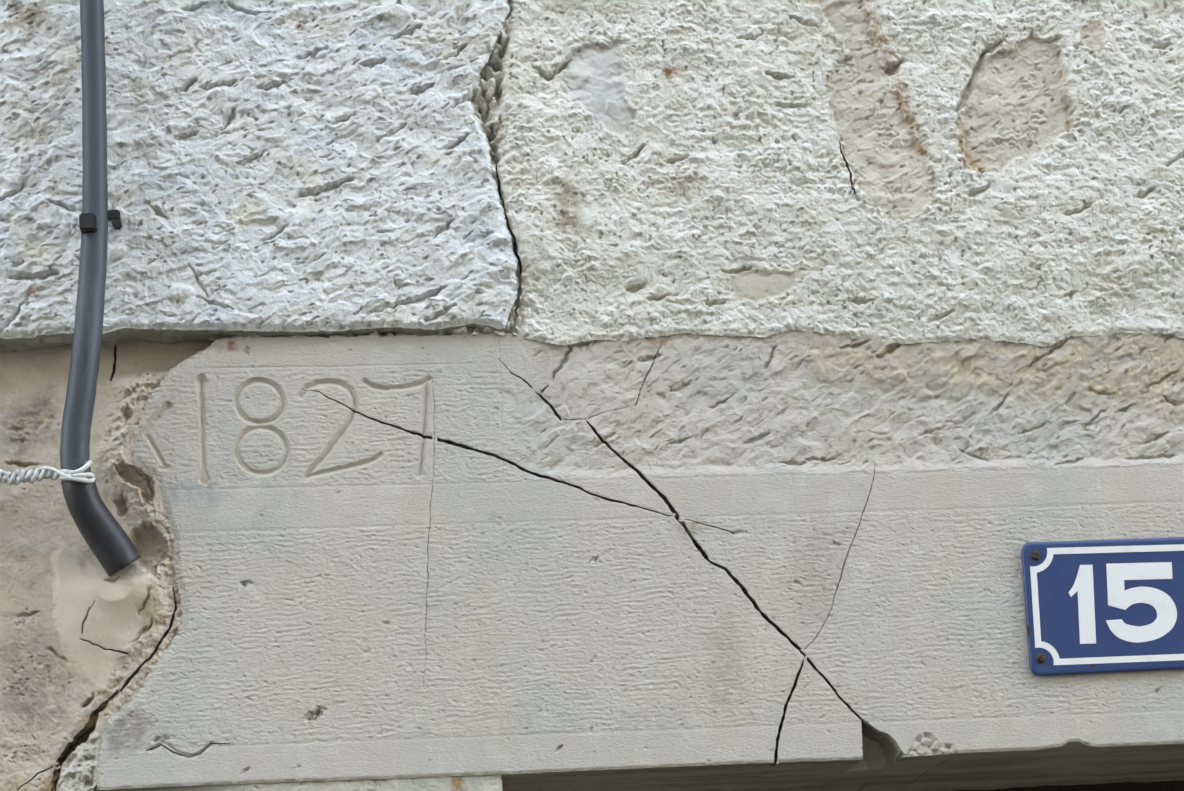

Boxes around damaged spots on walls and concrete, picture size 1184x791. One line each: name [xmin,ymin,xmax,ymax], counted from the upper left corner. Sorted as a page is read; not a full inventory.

spalling [57,348,194,791]
peeling [121,767,251,791]
crack [303,346,876,766]
peeling [821,732,958,791]